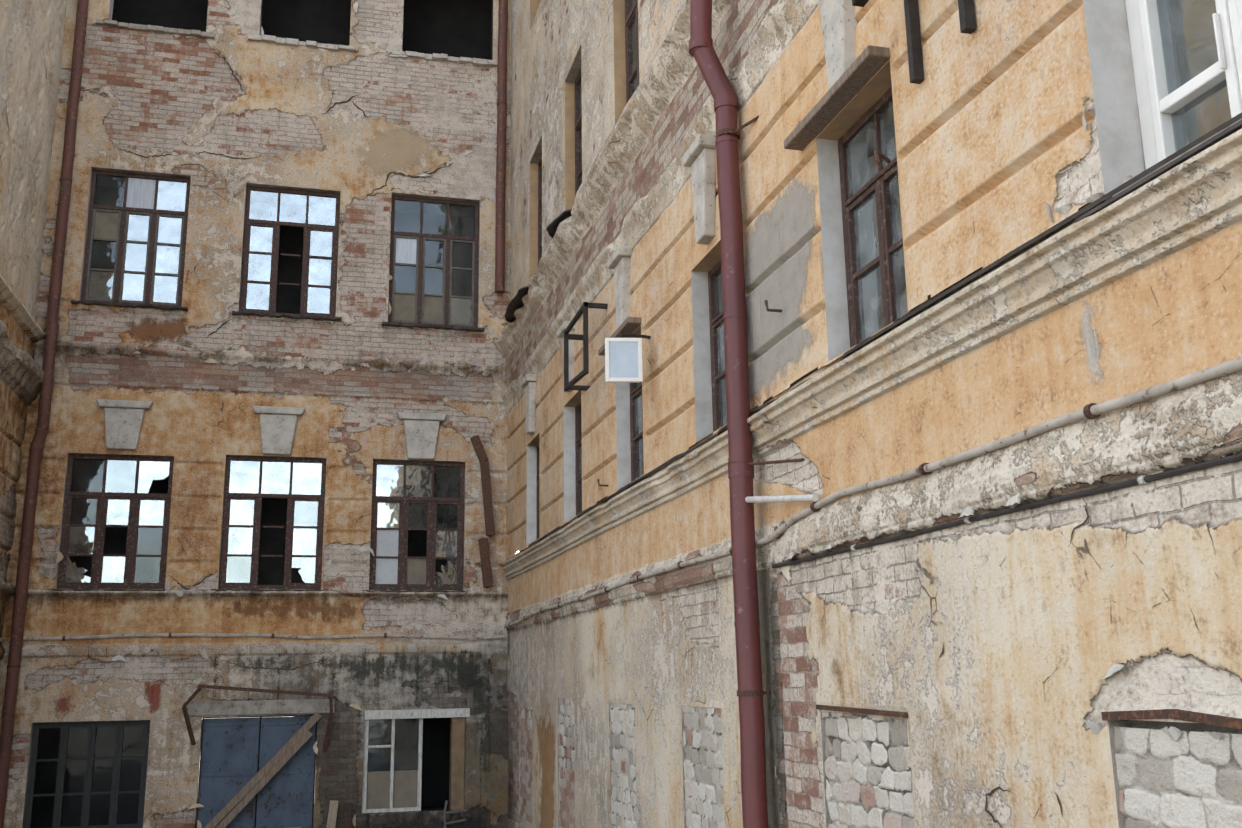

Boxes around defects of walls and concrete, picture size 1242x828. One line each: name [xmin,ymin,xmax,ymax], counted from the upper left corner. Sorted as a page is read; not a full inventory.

spalling [62,0,505,449]
crack [323,94,369,118]
crack [362,158,453,197]
spalling [1045,87,1105,221]
spalling [770,442,1242,828]
leakage [322,650,497,788]